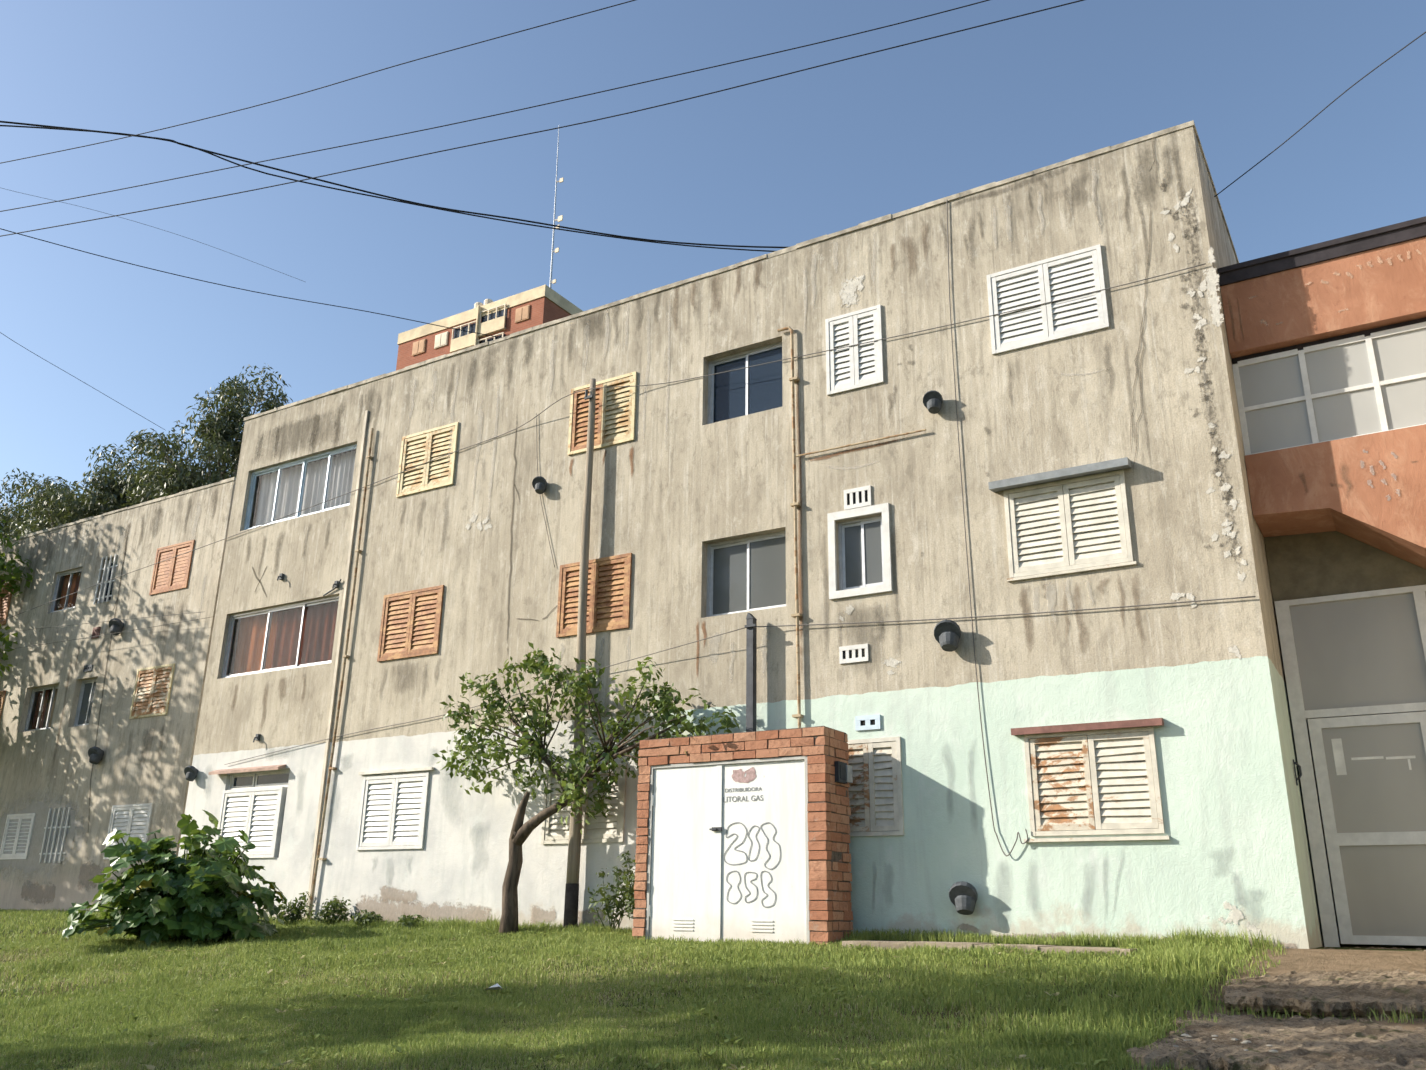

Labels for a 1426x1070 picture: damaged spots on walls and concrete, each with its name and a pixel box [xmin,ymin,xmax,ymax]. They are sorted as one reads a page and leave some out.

crack [1149,138,1157,181]
peeling [1160,189,1192,215]
peeling [1186,247,1224,330]
crack [1130,214,1151,461]
peeling [1206,445,1247,581]